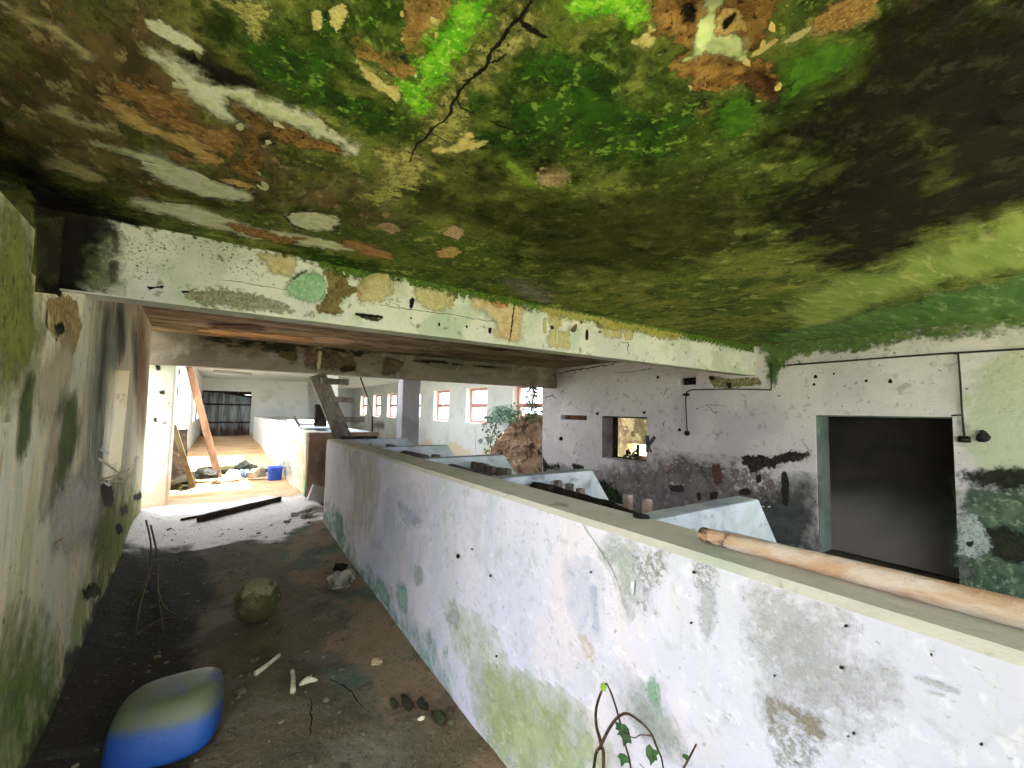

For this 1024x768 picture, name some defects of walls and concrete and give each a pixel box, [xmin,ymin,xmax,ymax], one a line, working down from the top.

peeling [39,104,355,251]
peeling [144,19,359,156]
crack [409,0,547,162]
peeling [742,21,813,66]
water stain [734,0,1024,273]
spalling [46,293,82,354]
spalling [315,269,358,316]
water stain [17,336,74,520]
water stain [598,457,739,511]
spalling [666,450,810,508]
water stain [753,481,819,548]
water stain [954,466,1024,598]